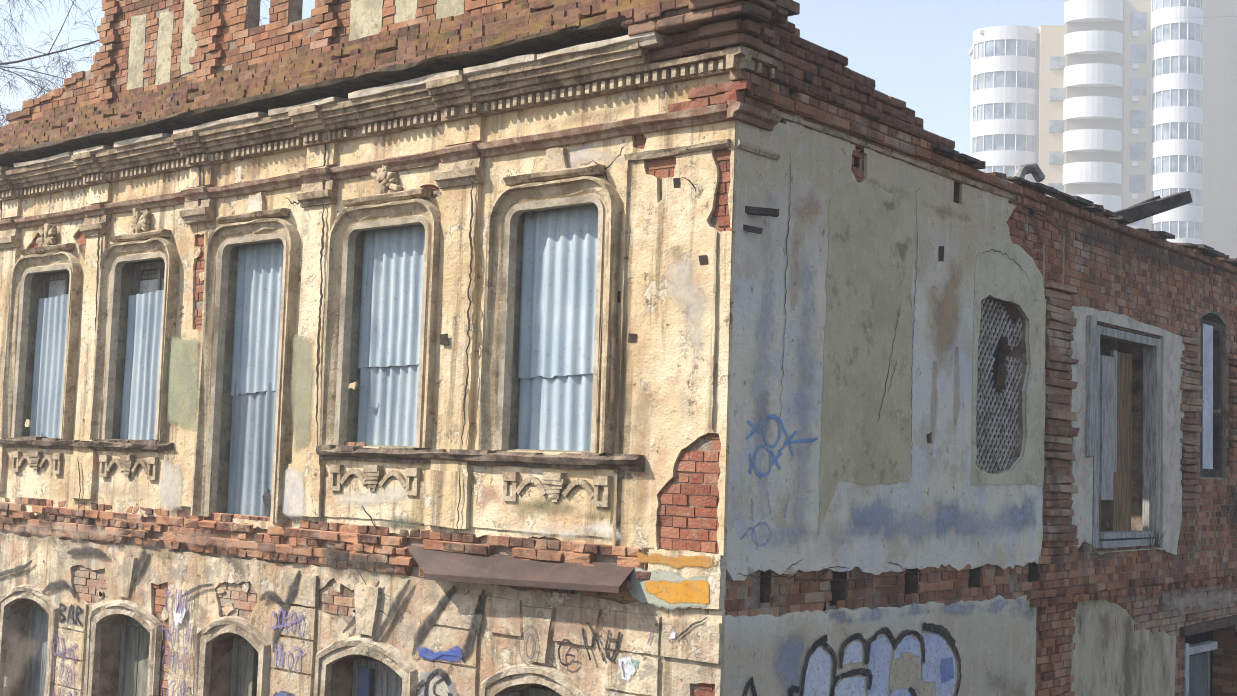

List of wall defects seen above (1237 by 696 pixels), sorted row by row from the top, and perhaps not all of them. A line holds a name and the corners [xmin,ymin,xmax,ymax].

crack [287,143,327,446]
crack [456,161,474,529]
crack [879,200,918,476]
spalling [627,433,721,609]